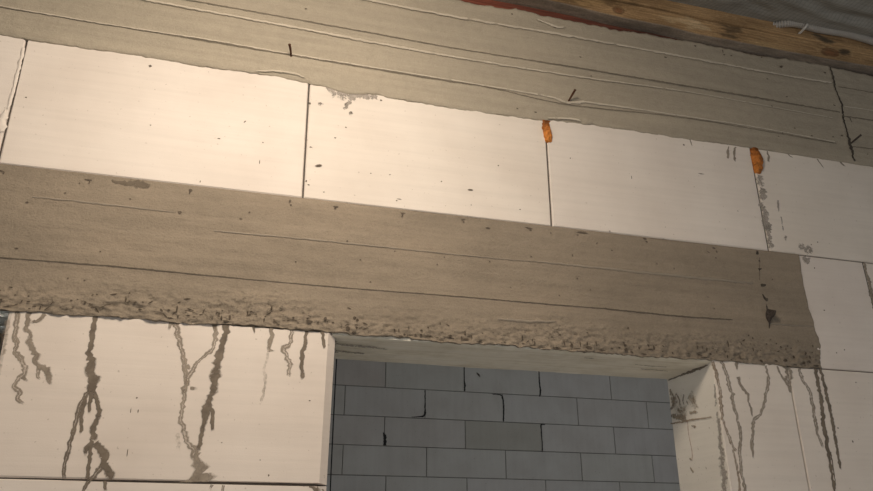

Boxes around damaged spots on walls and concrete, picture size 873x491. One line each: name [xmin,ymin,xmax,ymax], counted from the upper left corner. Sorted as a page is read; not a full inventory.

crack [830,67,856,162]
crack [756,251,768,310]
water stain [12,312,52,403]
water stain [62,316,115,491]
water stain [168,322,230,491]
water stain [267,327,308,378]
water stain [711,360,841,491]